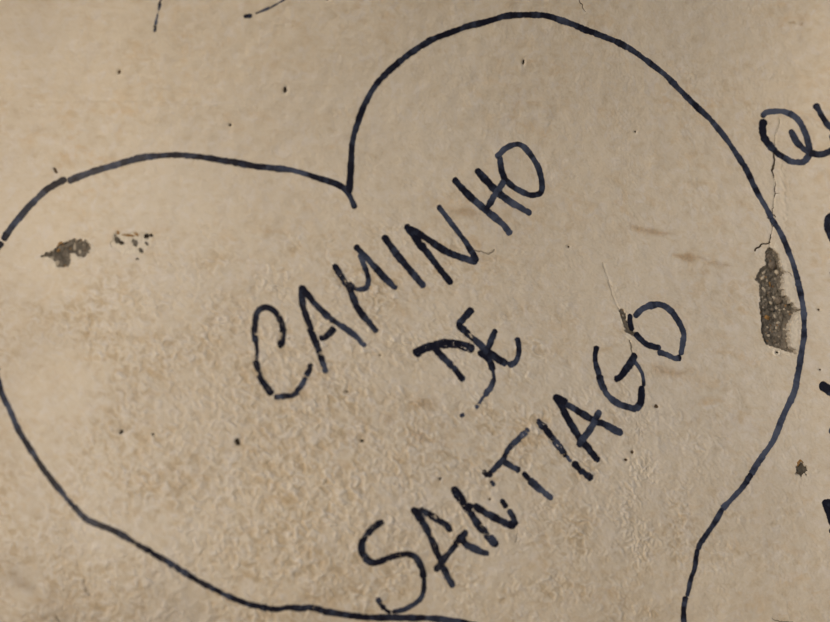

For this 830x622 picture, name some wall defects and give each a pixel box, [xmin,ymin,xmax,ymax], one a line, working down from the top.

flaking render [41,239,95,270]
flaking render [111,231,153,260]
crack [754,153,777,252]
flaking render [755,242,800,357]